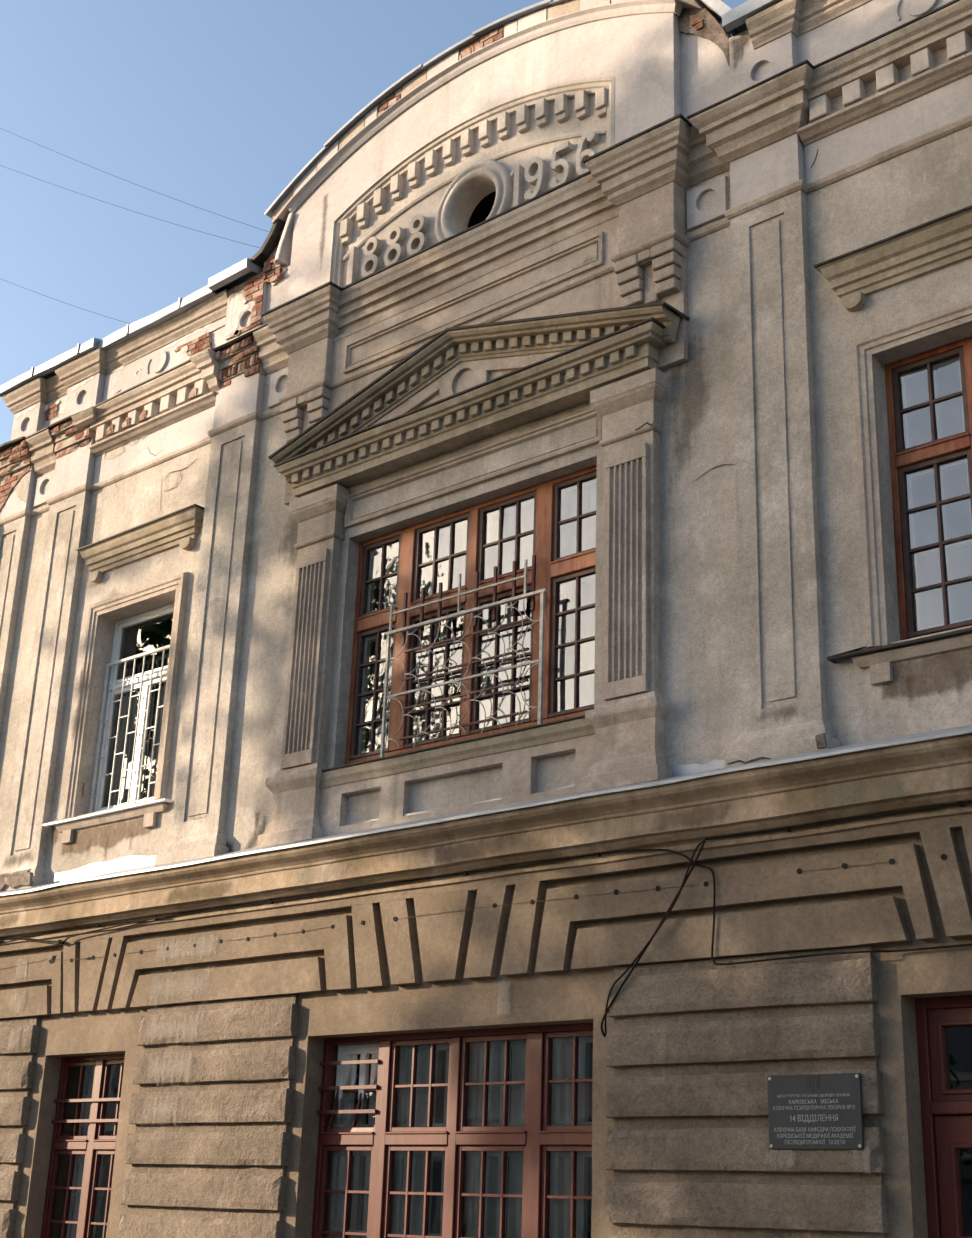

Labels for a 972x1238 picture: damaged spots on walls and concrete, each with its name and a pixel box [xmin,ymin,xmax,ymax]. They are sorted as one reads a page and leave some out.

flaking render [159,229,287,400]
flaking render [16,376,148,459]
flaking render [0,436,34,511]